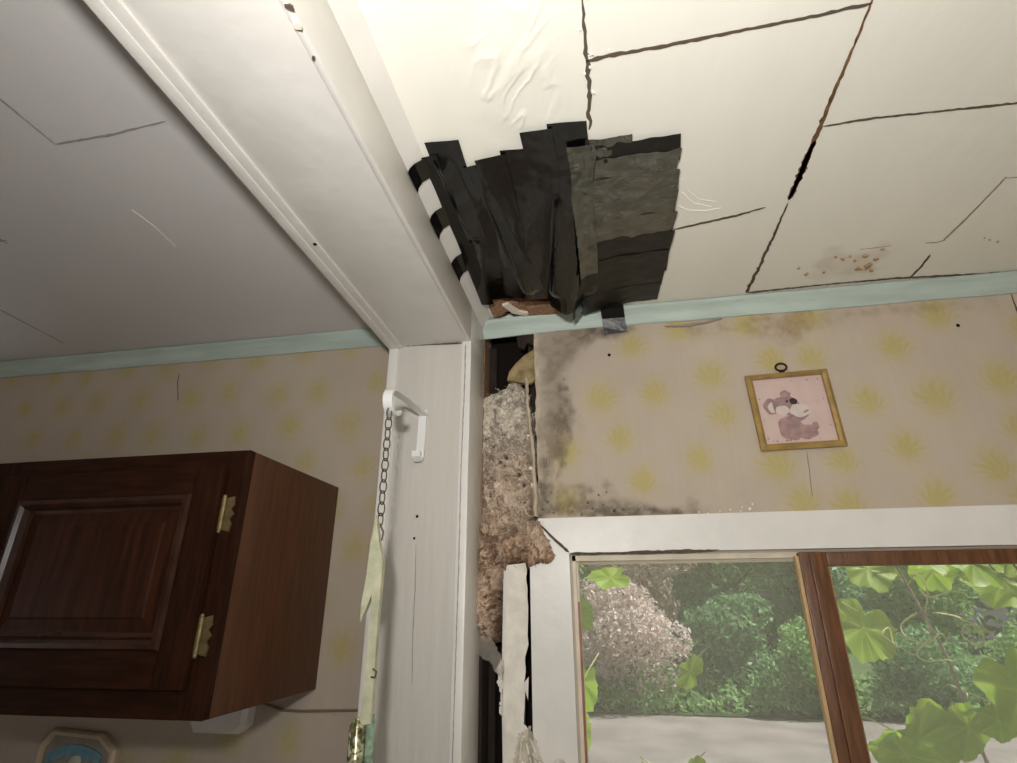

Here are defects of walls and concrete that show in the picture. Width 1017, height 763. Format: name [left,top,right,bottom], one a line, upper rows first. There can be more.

crack [0,98,165,145]
crack [578,0,1017,311]
spalling [483,334,542,519]
spalling [478,655,497,763]